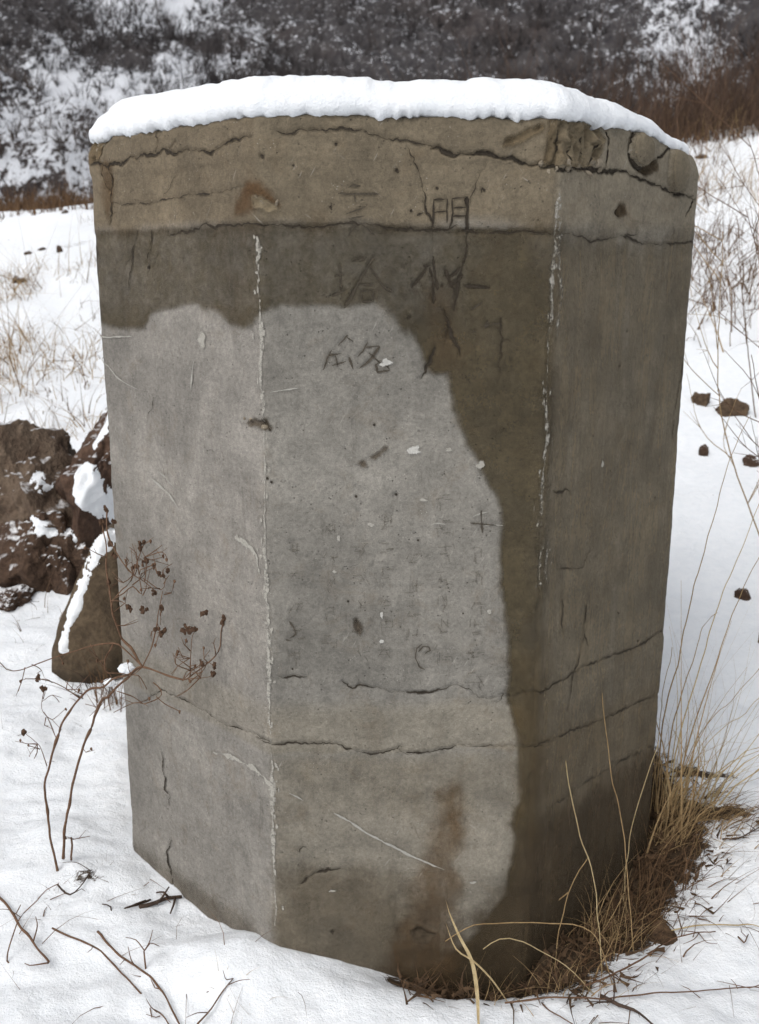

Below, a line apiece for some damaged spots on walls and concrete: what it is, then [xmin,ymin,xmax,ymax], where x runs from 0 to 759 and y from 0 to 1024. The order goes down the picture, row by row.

corrosion [236,183,274,211]
spalling [503,119,606,177]
spalling [638,160,658,176]
crack [92,123,694,381]
leakage [95,193,694,998]
crack [342,598,661,701]
crack [143,688,655,755]